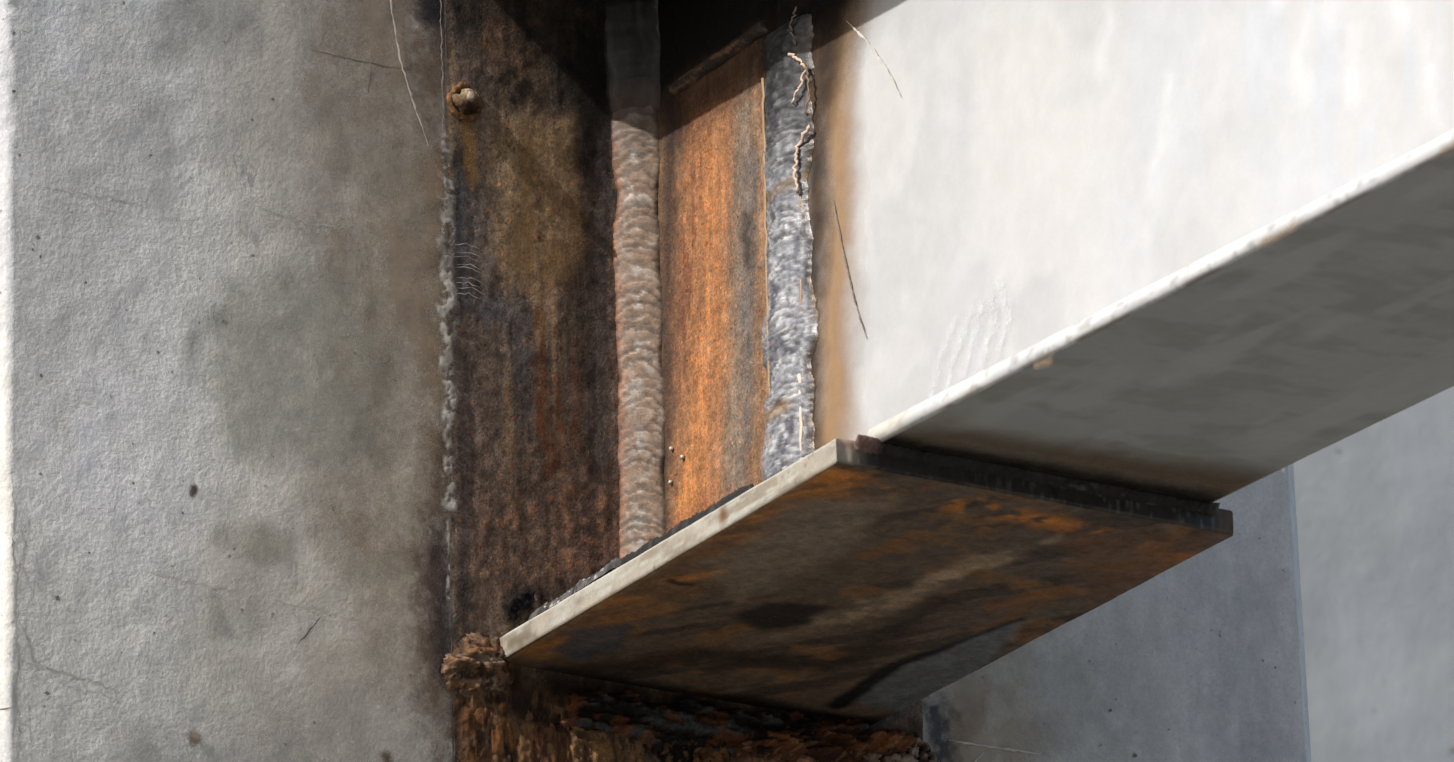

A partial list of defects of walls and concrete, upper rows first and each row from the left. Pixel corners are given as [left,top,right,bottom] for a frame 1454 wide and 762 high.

damp [335,0,457,762]
crack [0,475,120,754]
corrosion [441,632,1021,762]